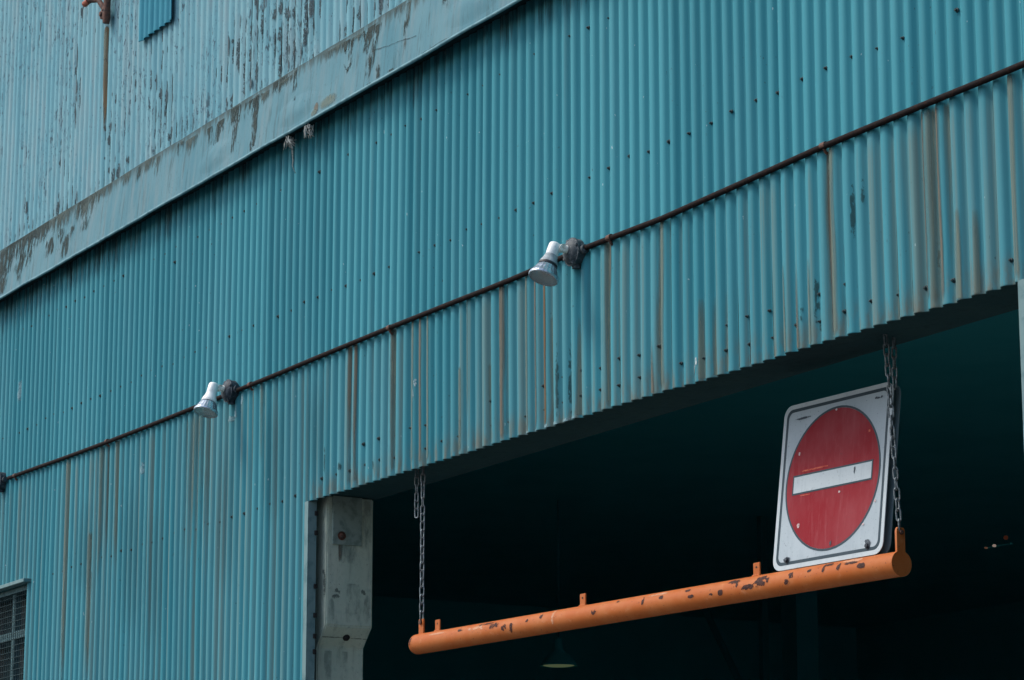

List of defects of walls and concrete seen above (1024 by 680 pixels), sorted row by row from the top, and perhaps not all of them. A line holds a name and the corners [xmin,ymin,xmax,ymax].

peeling [148,33,193,147]
peeling [216,0,321,111]
peeling [339,0,389,41]
peeling [53,154,77,216]
peeling [99,156,129,185]
rust [347,344,358,457]
rust [525,276,582,428]
rust [605,242,621,402]
rust [772,148,837,352]
rust [921,106,981,299]
rust [1007,76,1018,272]
rust [86,440,120,658]